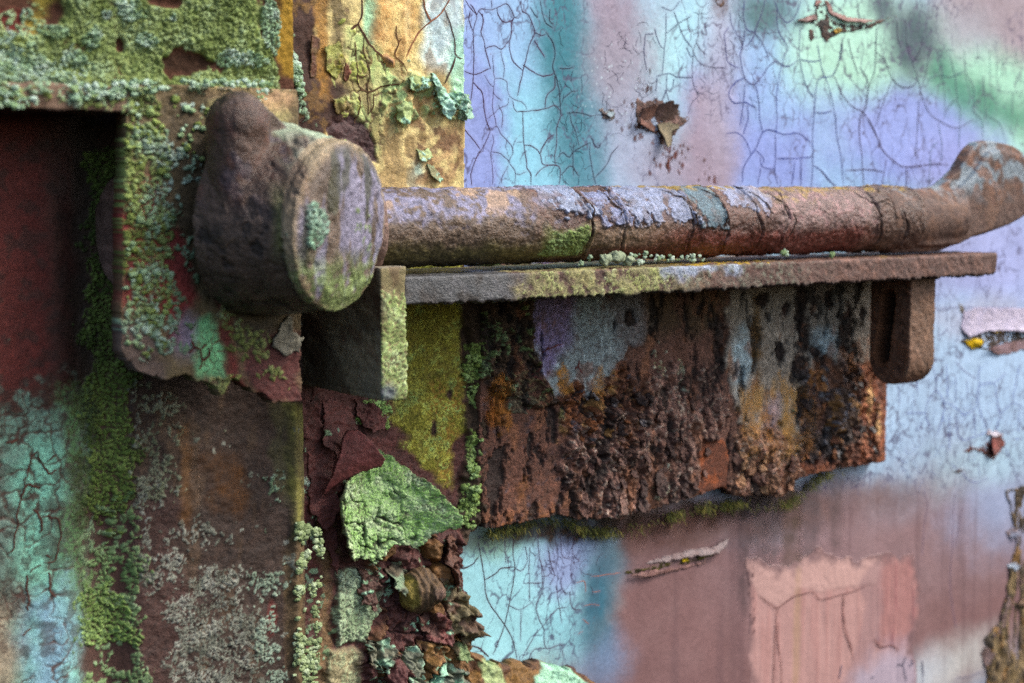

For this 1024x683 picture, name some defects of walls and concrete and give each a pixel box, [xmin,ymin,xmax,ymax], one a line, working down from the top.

peeling [797,0,896,42]
peeling [395,73,474,124]
rust [629,127,689,175]
peeling [634,98,689,147]
crack [351,0,1020,246]
crack [531,344,583,382]
peeling [958,303,1024,355]
rust [513,365,882,543]
crack [887,364,1023,489]
crack [6,438,62,636]
peeling [302,398,492,683]
crack [460,520,617,658]